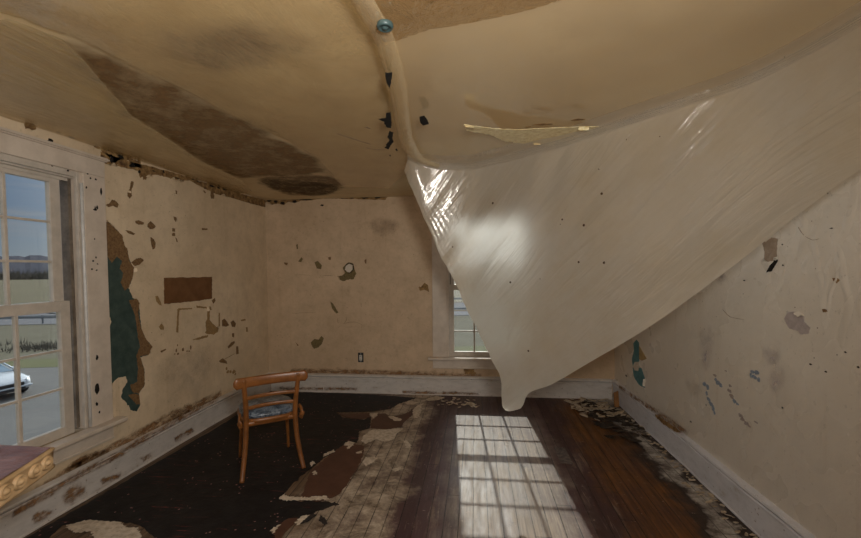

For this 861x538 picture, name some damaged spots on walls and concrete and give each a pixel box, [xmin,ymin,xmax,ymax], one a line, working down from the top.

damp [81,53,343,196]
peeling [94,145,387,207]
peeling [338,263,356,281]
peeling [762,237,784,272]
peeling [91,219,192,411]
peeling [205,298,248,354]
peeling [784,311,810,335]
peeling [625,340,647,388]